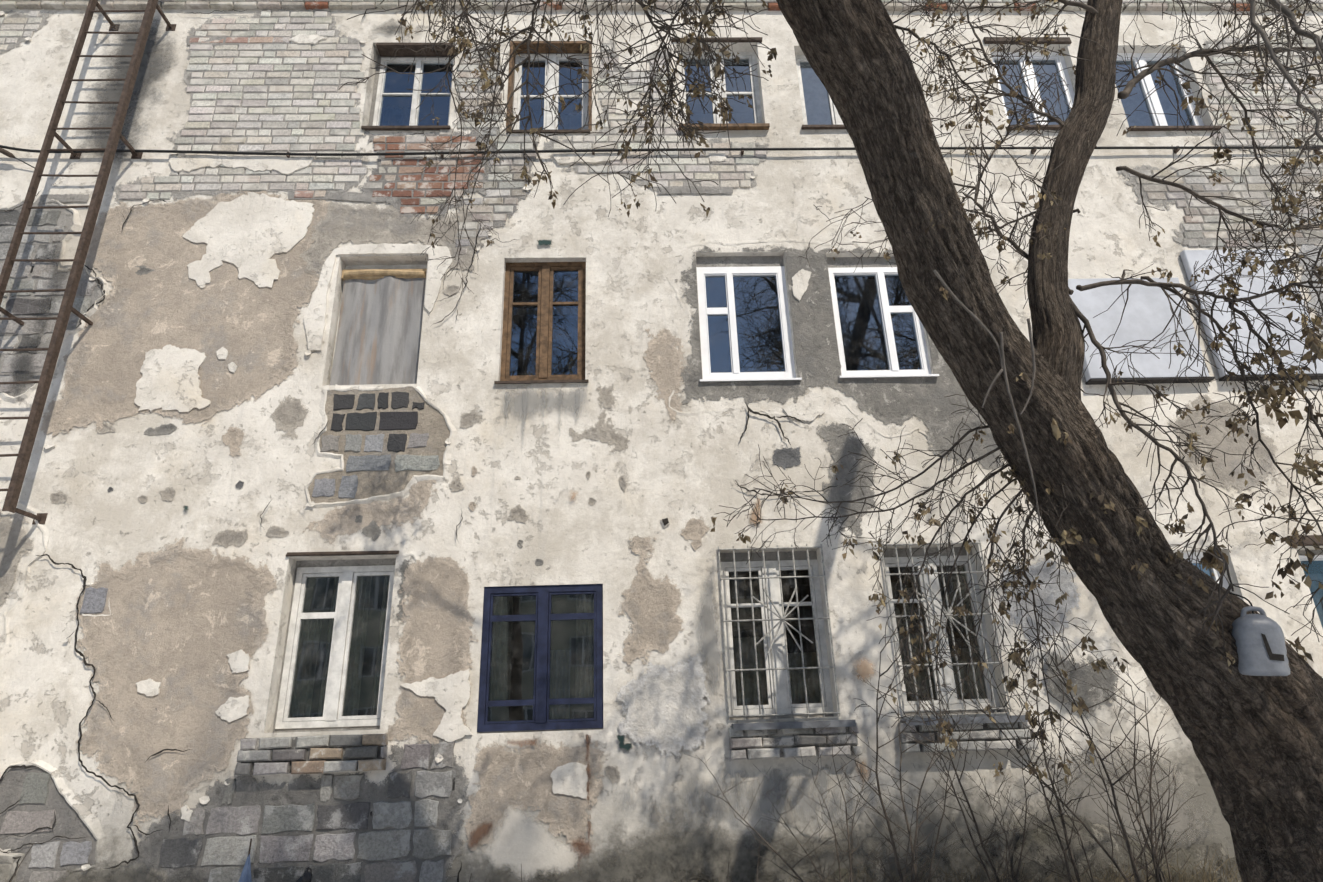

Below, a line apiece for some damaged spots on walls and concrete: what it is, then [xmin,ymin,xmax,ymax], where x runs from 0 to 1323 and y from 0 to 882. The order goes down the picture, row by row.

flaking render [0,10,50,53]
peeling [37,8,770,452]
peeling [222,426,245,458]
peeling [0,492,67,657]
crack [0,765,85,882]
crack [36,554,172,869]
damp [55,868,197,882]
crack [146,749,191,761]
damp [483,769,879,882]
damp [917,826,1022,882]
damp [1055,751,1206,846]